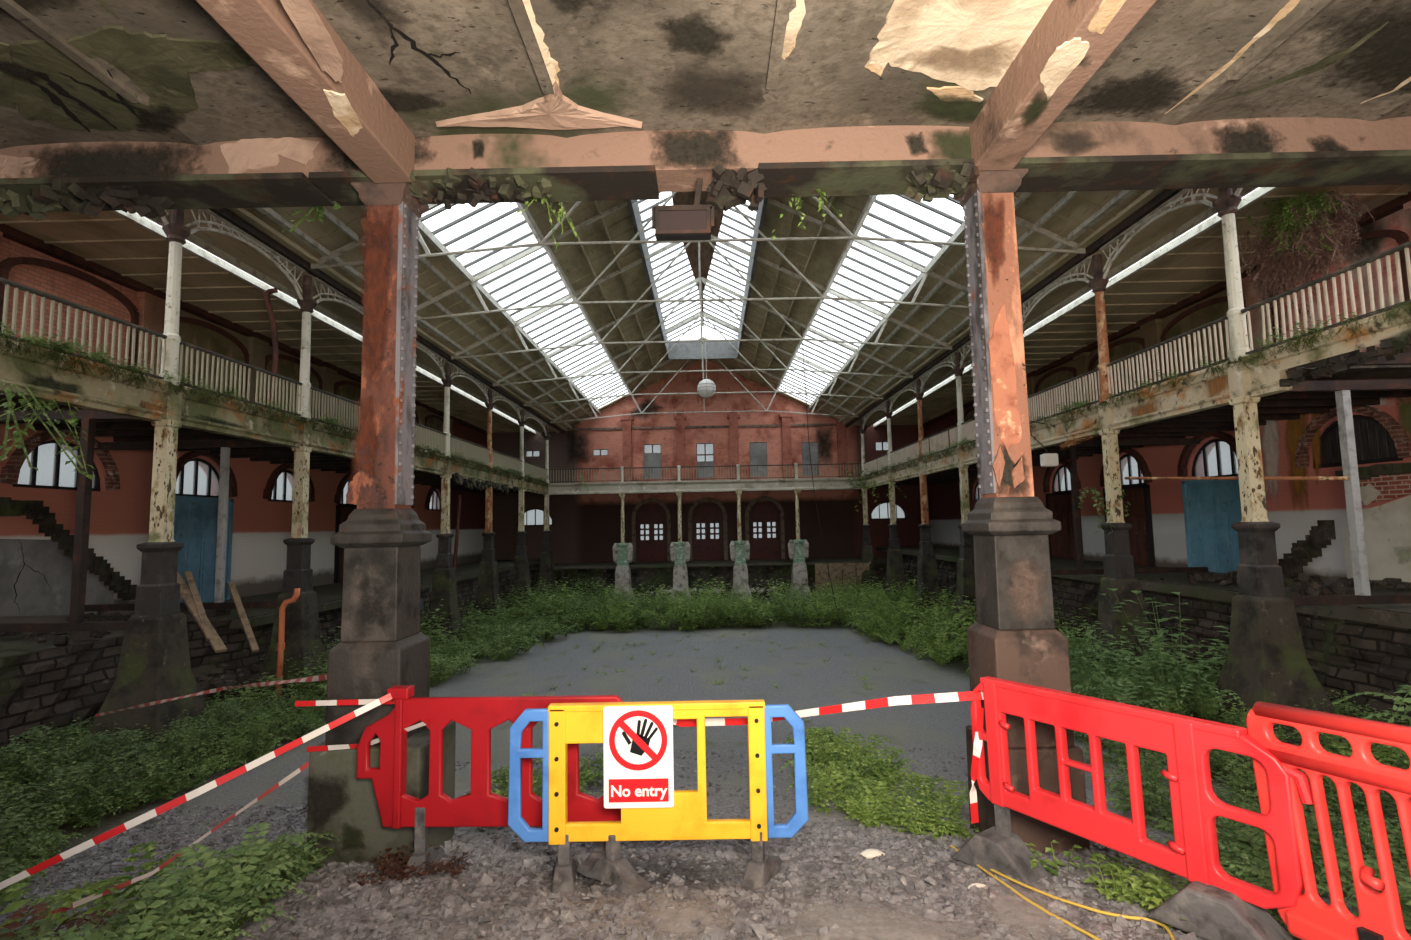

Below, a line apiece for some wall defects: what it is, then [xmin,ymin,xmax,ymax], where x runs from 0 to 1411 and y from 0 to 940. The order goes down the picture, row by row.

flaking render [280,0,363,137]
crack [367,0,471,94]
leakage [552,0,585,12]
leakage [662,15,730,54]
flaking render [865,0,1053,101]
leakage [1071,71,1181,114]
leakage [1057,132,1097,154]
corrosion [984,200,1005,279]
corrosion [362,218,391,374]
corrosion [353,399,378,477]
corrosion [992,445,1028,494]
spalling [1359,473,1411,506]